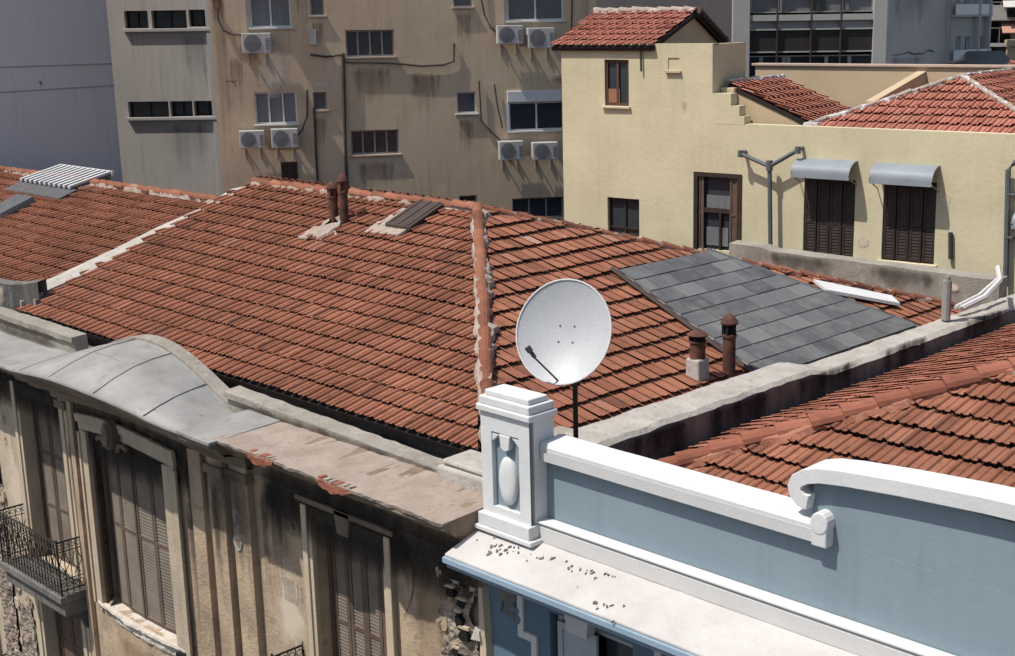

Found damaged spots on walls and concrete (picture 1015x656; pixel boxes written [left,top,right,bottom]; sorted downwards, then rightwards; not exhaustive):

water stain [886,339,925,368]
water stain [801,364,852,395]
water stain [715,394,766,435]
peeling [249,449,278,462]
water stain [635,425,683,456]
peeling [318,474,356,490]
spalling [0,483,39,656]
water stain [277,568,307,646]
spalling [435,566,521,656]